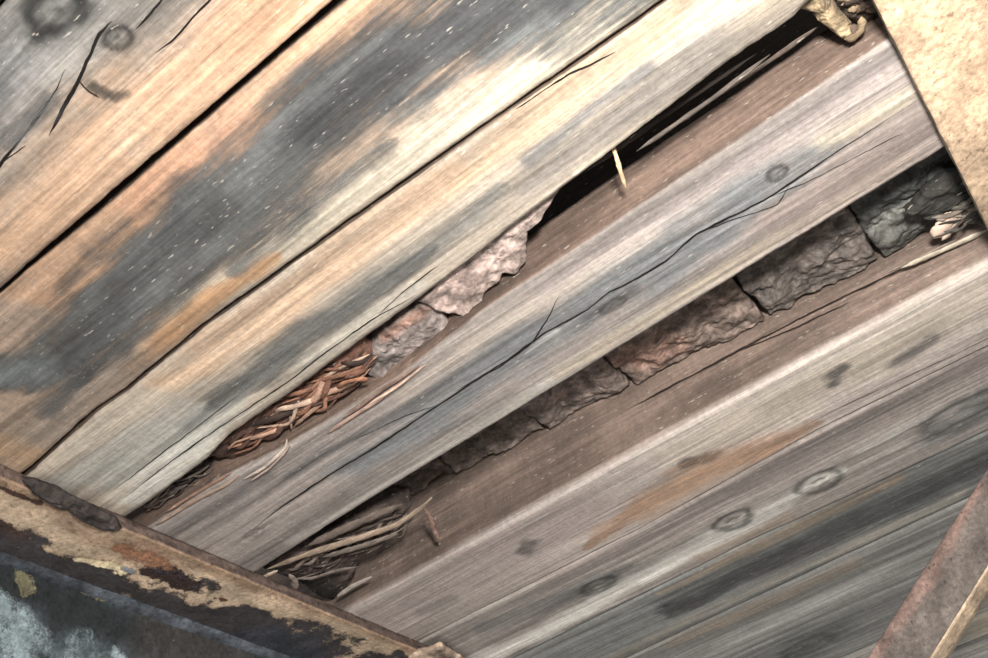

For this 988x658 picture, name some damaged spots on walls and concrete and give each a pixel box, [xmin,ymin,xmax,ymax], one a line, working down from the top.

crack [135,0,162,30]
crack [158,0,211,51]
crack [0,21,112,168]
water stain [0,0,654,417]
crack [249,104,912,533]
rust [0,486,44,505]
peeling [14,569,37,598]
peeling [73,558,137,576]
rust [0,520,409,658]
water stain [0,593,52,658]
water stain [62,633,124,658]